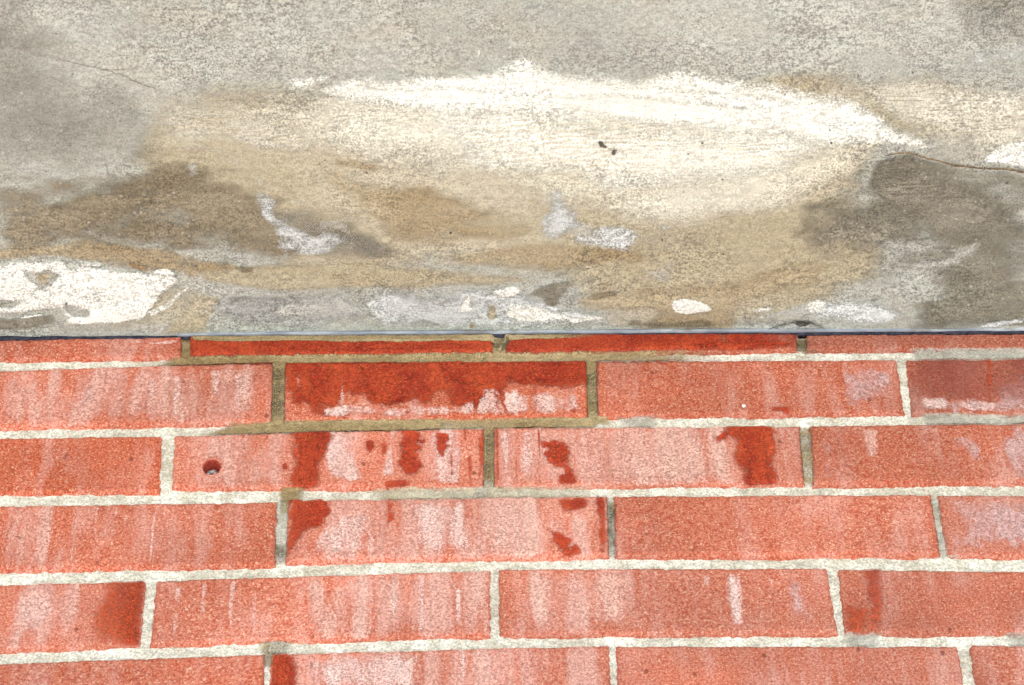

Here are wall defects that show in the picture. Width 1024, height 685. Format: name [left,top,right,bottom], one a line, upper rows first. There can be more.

leakage [0,59,1024,561]